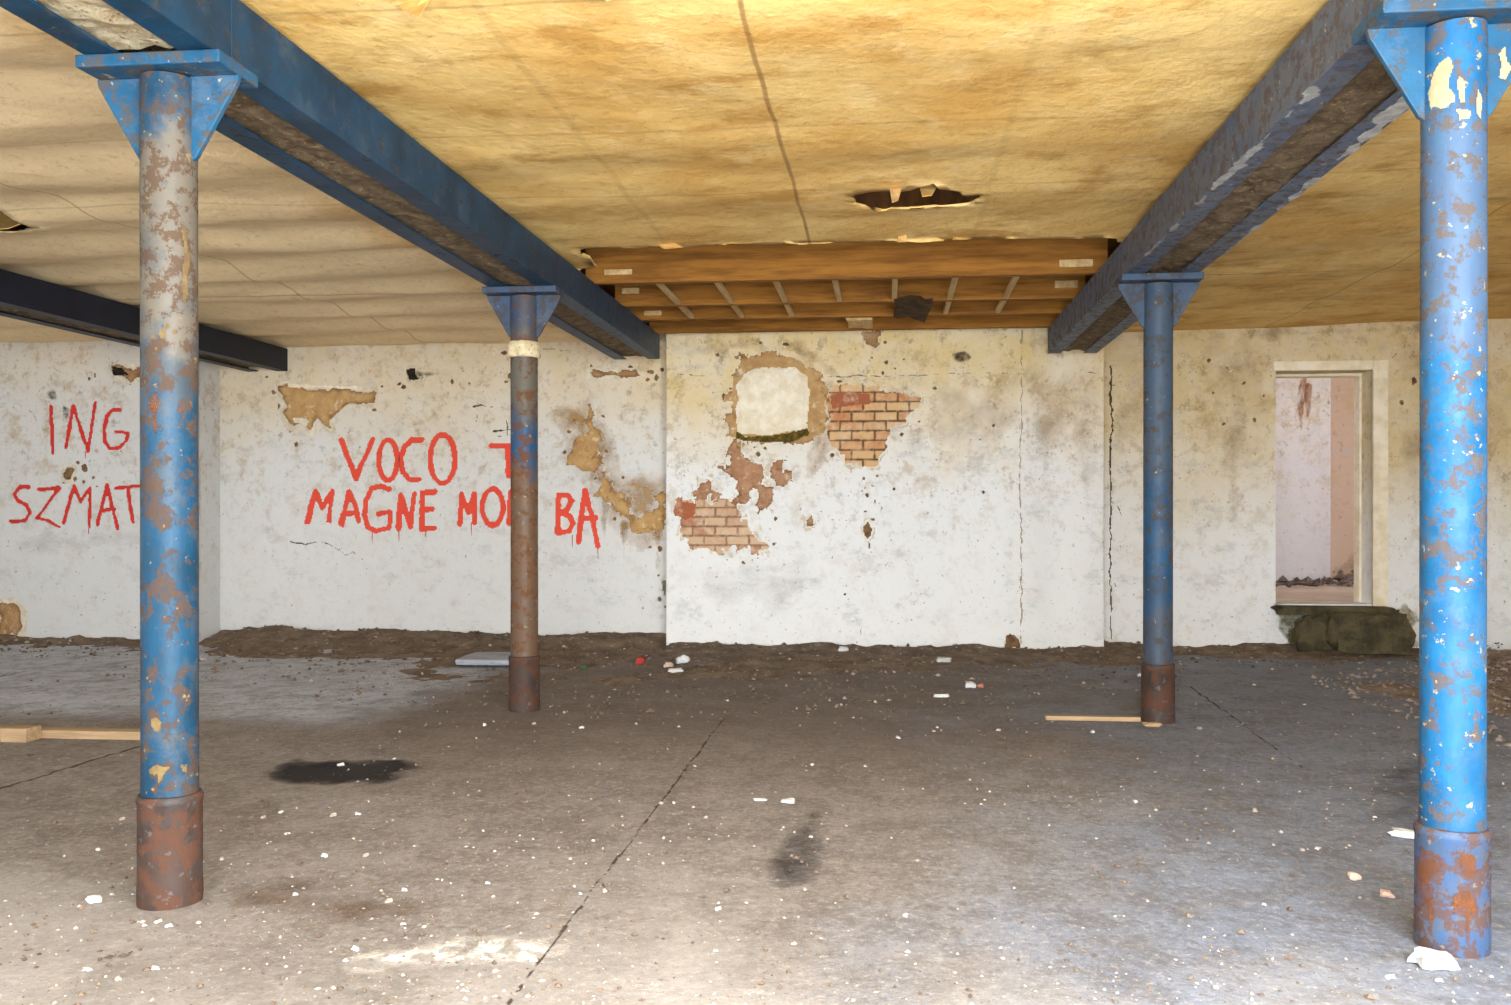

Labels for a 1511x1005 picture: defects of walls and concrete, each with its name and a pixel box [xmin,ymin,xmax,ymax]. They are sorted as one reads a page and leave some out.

peeling [1428,57,1483,121]
peeling [1499,47,1511,80]
spalling [88,364,140,385]
peeling [265,364,426,447]
peeling [563,402,675,552]
peeling [586,365,664,382]
peeling [692,330,937,564]
crack [506,715,726,1005]
rust [1416,851,1441,927]
rust [1453,854,1477,942]